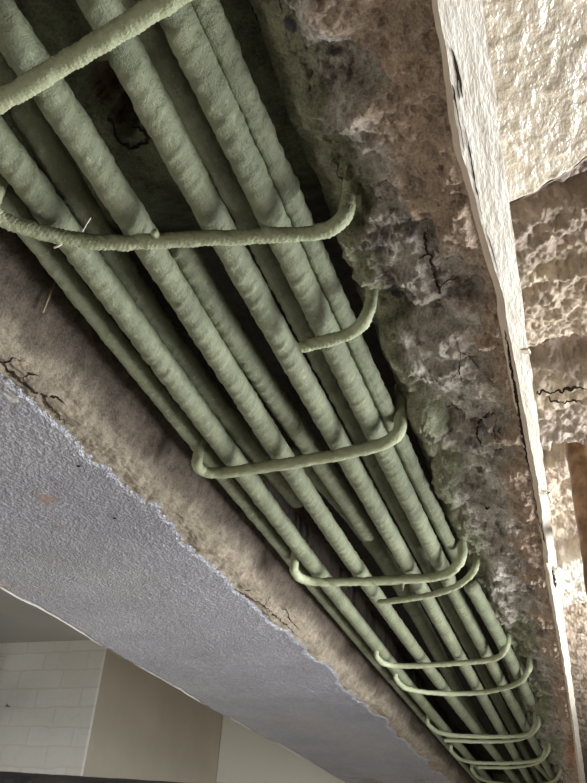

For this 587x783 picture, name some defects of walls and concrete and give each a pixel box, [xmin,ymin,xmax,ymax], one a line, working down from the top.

spalling [14,0,93,56]
spalling [1,111,40,169]
spalling [64,54,202,235]
spalling [202,162,236,226]
crack [451,48,499,275]
crack [419,225,457,307]
crack [0,357,66,425]
spalling [219,0,587,783]
crack [451,340,480,387]
crack [476,330,587,542]
spalling [0,227,486,783]